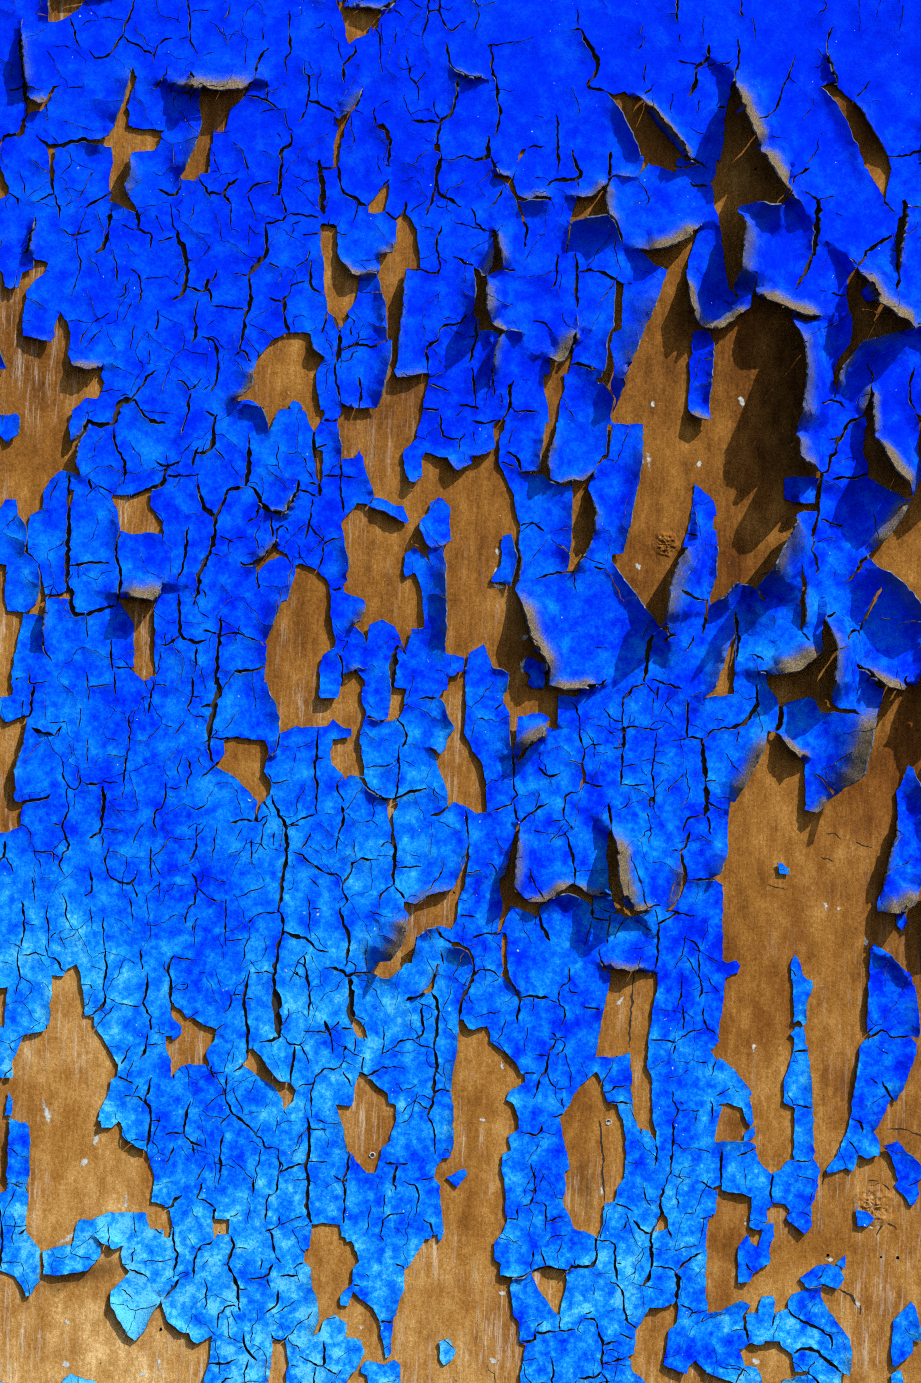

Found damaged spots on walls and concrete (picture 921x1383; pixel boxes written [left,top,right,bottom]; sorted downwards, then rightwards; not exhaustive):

peeling [87,61,267,212]
crack [505,11,624,332]
peeling [0,260,107,833]
peeling [111,490,164,534]
peeling [108,570,177,681]
crack [0,0,600,1383]
peeling [216,57,921,1383]
crack [486,594,783,881]
crack [794,365,906,691]
peeling [0,964,218,1383]
crack [498,933,755,1383]
crack [772,1267,861,1383]